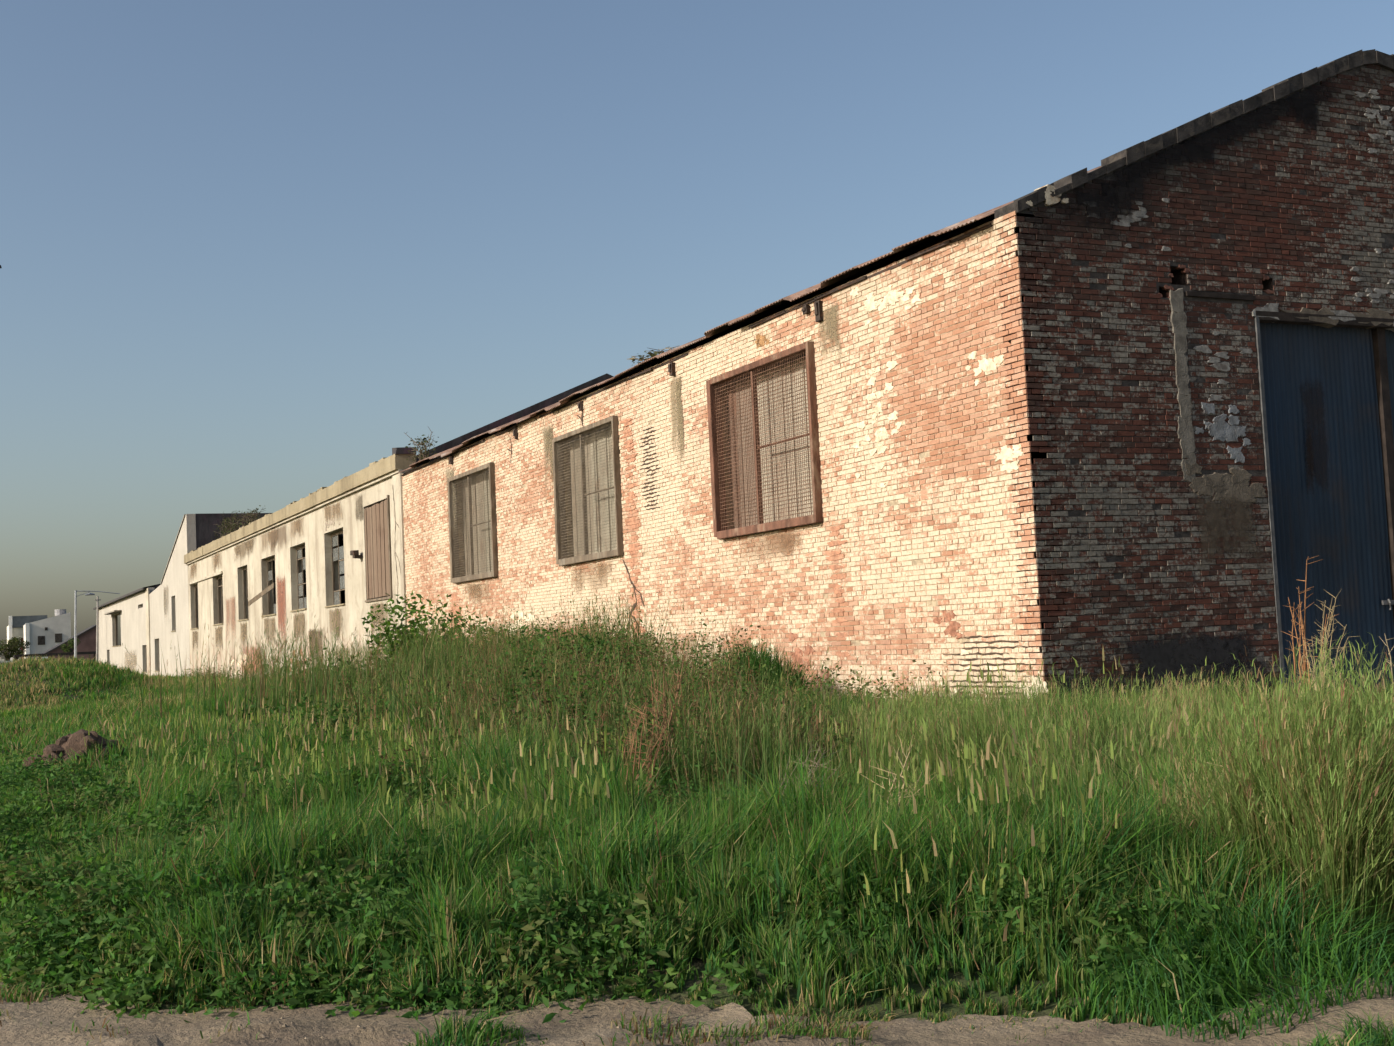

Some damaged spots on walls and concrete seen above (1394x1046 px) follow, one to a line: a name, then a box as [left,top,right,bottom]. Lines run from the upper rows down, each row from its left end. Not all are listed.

damp [1355,83,1394,154]
damp [1076,82,1332,248]
peeling [850,284,921,326]
damp [671,378,683,445]
peeling [853,360,902,488]
peeling [965,351,1004,386]
peeling [995,444,1024,472]
peeling [1193,331,1252,464]
corrosion [277,579,286,633]
damp [1025,632,1271,712]